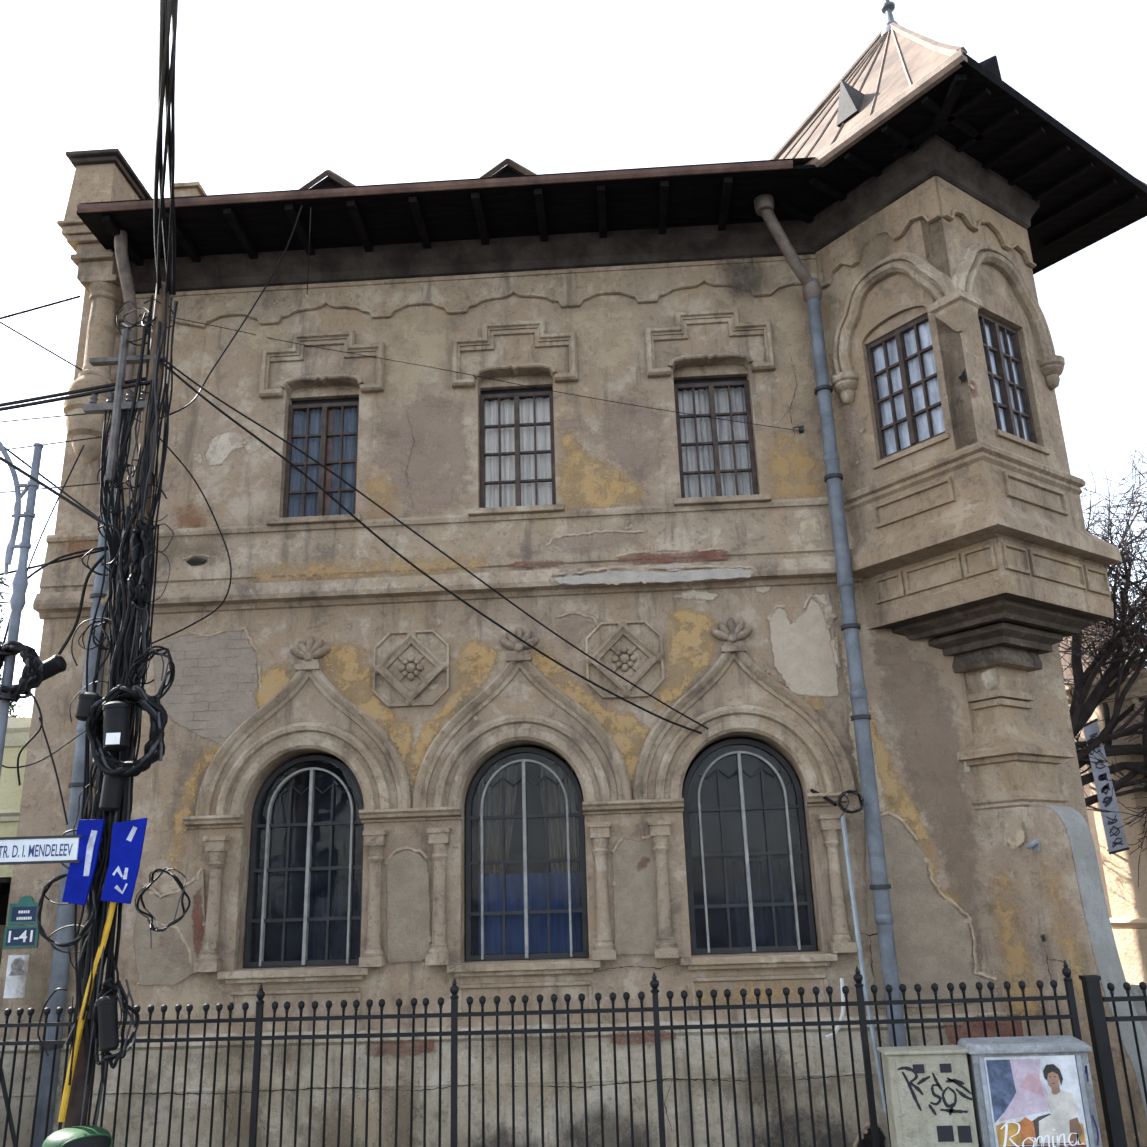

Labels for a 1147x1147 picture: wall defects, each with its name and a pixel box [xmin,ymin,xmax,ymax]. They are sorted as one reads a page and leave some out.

flaking render [194,431,263,466]
spalling [509,547,771,711]
spalling [153,627,293,872]
peeling [321,640,498,783]
flaking render [765,591,864,816]
spalling [869,713,999,1008]
spalling [134,868,206,986]
water stain [317,1084,416,1147]
water stain [564,1106,651,1147]
water stain [744,1044,792,1099]
water stain [754,1111,848,1147]
spalling [945,1014,1024,1045]